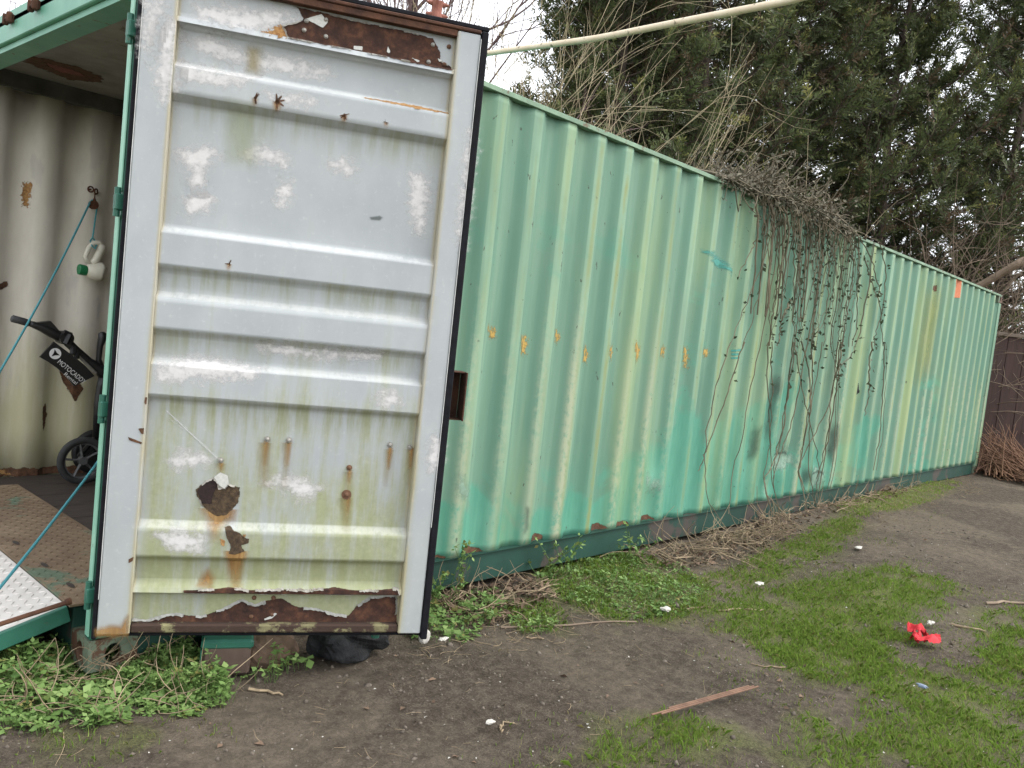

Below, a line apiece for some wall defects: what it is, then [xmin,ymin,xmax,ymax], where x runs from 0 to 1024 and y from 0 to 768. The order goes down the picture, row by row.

peeling [192,2,453,70]
rust [21,181,33,208]
peeling [179,146,219,214]
peeling [244,146,290,169]
rust [206,509,249,579]
rust [591,520,628,530]